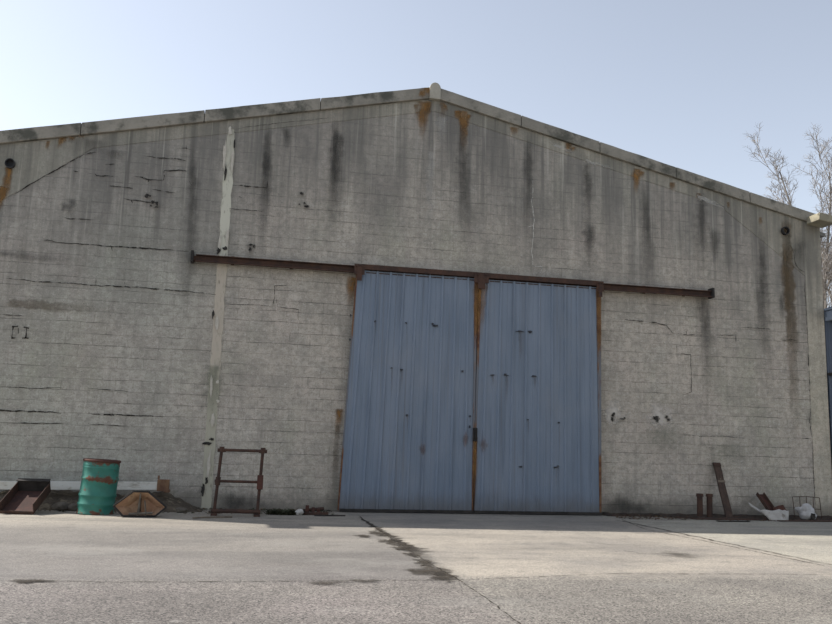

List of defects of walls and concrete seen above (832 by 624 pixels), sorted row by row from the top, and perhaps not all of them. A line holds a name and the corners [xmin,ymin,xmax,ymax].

rust [415,88,431,124]
rust [0,168,12,205]
crack [15,147,192,203]
peeling [223,126,235,180]
damp [781,227,796,343]